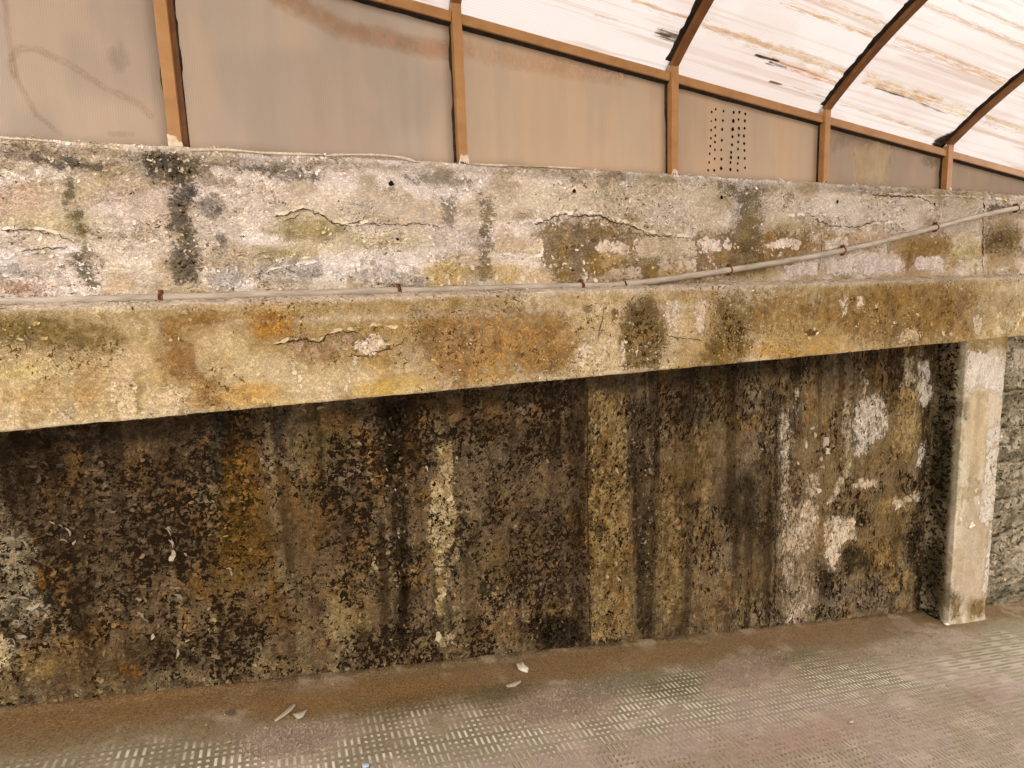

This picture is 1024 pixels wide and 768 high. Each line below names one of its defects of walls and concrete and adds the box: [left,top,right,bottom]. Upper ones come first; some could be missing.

damp [1,149,321,287]
crack [274,208,443,229]
crack [531,214,687,239]
crack [274,330,404,365]
damp [611,295,671,371]
damp [206,411,229,482]
damp [380,397,412,652]
peeling [0,135,1024,707]
damp [628,395,686,635]
damp [693,387,820,583]
damp [785,522,925,625]
damp [516,613,585,649]